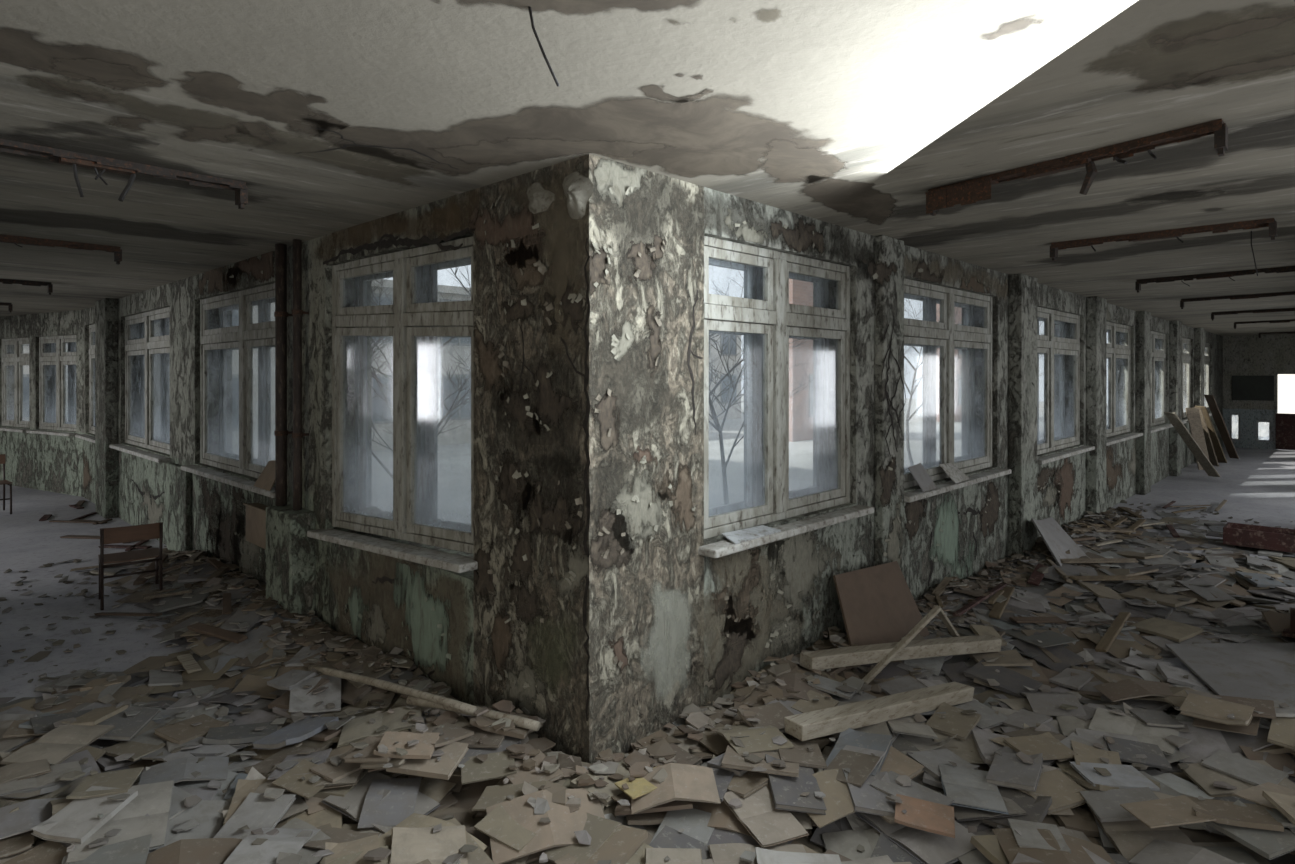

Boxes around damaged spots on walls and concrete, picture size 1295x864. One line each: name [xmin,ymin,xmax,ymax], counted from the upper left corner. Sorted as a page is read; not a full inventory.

peeling [594,158,647,210]
peeling [1037,457,1075,521]
peeling [1106,424,1136,492]
water stain [325,551,472,703]
peeling [686,530,842,694]